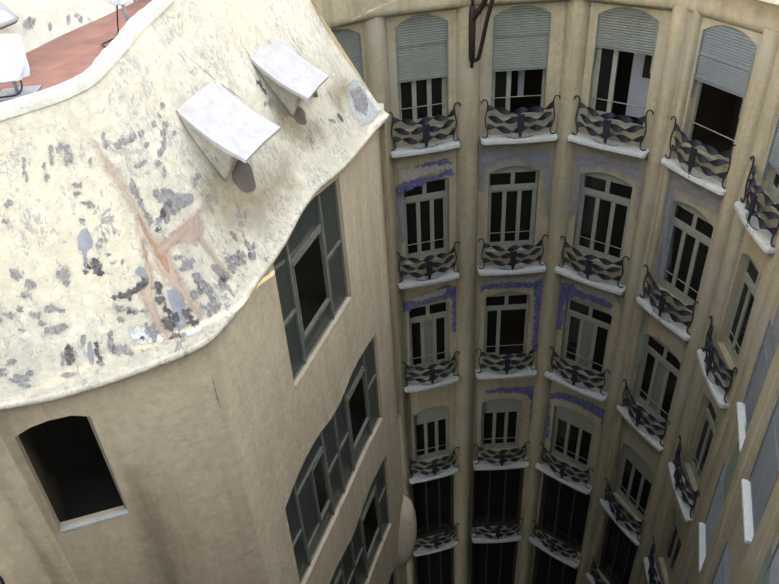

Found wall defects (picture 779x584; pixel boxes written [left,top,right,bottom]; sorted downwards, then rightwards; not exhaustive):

peeling [350,86,382,115]
peeling [42,142,74,182]
peeling [71,182,95,209]
spalling [52,218,124,287]
peeling [0,266,69,336]
spalling [110,231,256,343]
peeling [0,359,35,389]
peeling [59,331,134,379]